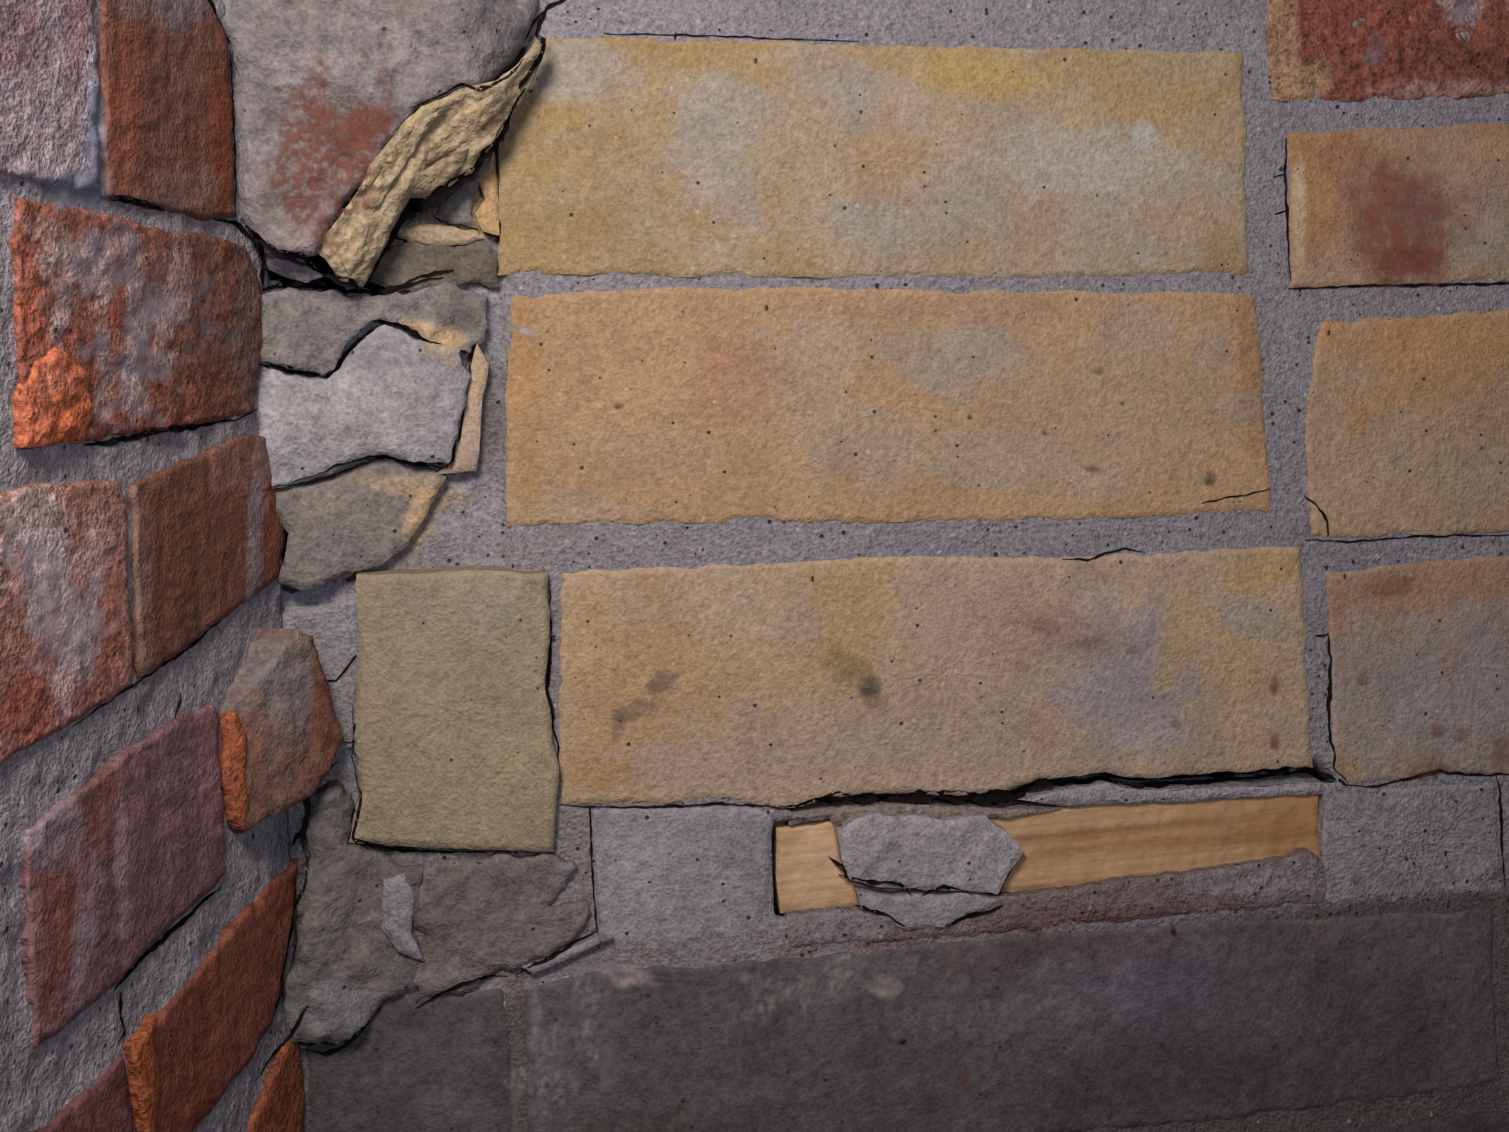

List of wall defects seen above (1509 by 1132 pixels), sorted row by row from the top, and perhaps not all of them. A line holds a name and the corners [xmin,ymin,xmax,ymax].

crack [208,0,565,295]
crack [255,579,1509,1082]
peeling [834,810,1024,930]